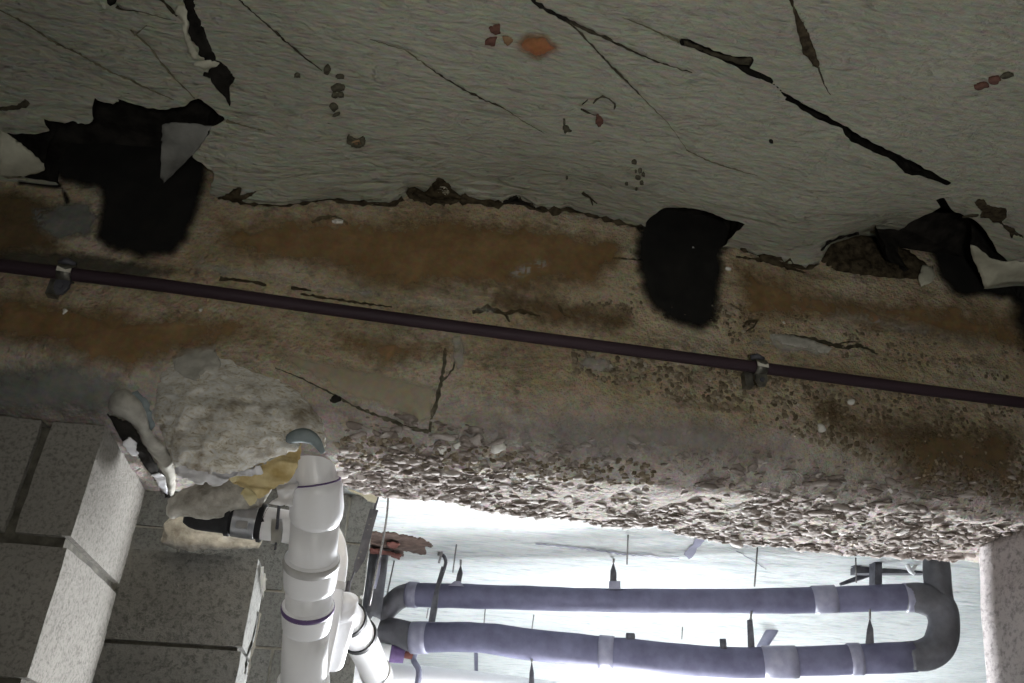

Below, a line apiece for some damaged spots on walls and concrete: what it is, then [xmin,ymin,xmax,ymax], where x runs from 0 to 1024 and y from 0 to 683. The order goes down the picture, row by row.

corrosion [485,24,556,57]
crack [370,39,542,132]
crack [531,0,757,176]
spalling [821,235,927,279]
crack [785,333,878,354]
spalling [710,303,1009,381]
crack [275,348,456,434]
spalling [332,349,1024,563]